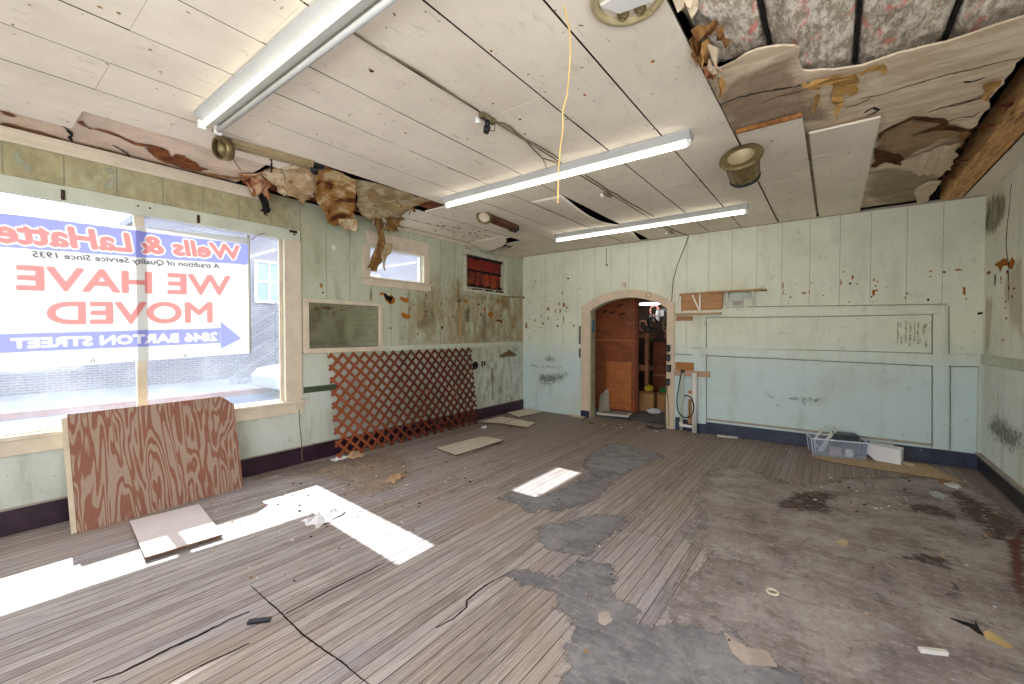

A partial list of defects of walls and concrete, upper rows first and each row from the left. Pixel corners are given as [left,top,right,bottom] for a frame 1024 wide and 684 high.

leakage [985,196,1005,233]
leakage [991,420,1022,449]